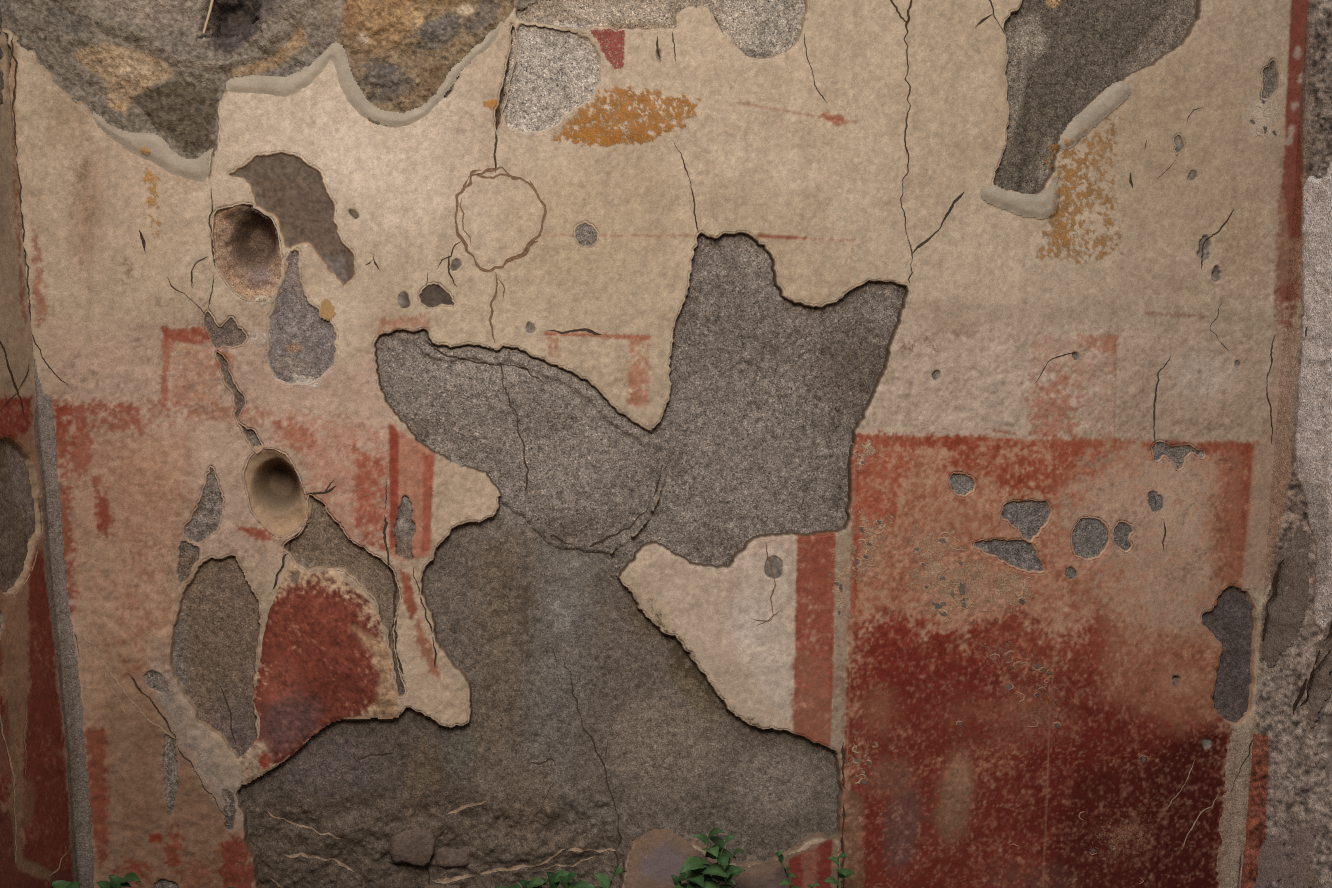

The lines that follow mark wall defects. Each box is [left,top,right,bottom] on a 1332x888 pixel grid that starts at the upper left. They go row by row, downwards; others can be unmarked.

crack [0,37,67,416]
flaking render [0,0,809,387]
crack [424,131,667,547]
crack [890,0,964,283]
flaking render [992,0,1204,194]
flaking render [0,435,44,598]
flaking render [145,466,262,764]
flaking render [202,231,910,888]
flaking render [1065,516,1135,579]
flaking render [1200,523,1311,728]
flaking render [163,734,178,814]